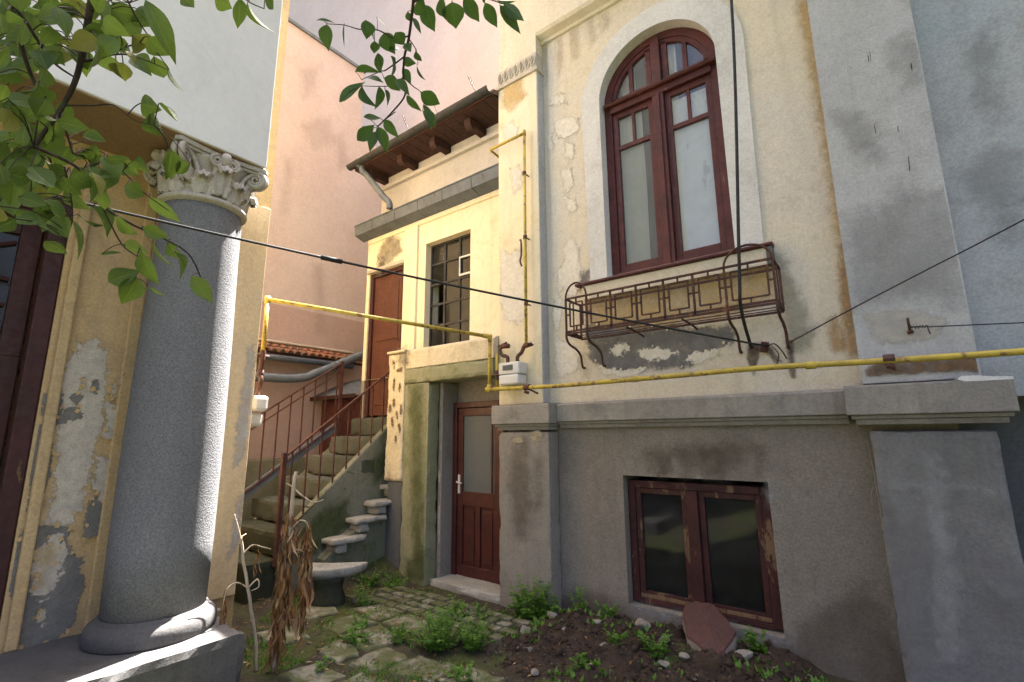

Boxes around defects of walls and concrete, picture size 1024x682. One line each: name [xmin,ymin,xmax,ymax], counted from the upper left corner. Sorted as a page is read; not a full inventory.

peeling [500,81,527,141]
peeling [509,164,523,196]
peeling [546,91,579,212]
peeling [499,246,528,325]
flaking render [18,338,131,648]
flaking render [9,531,24,606]